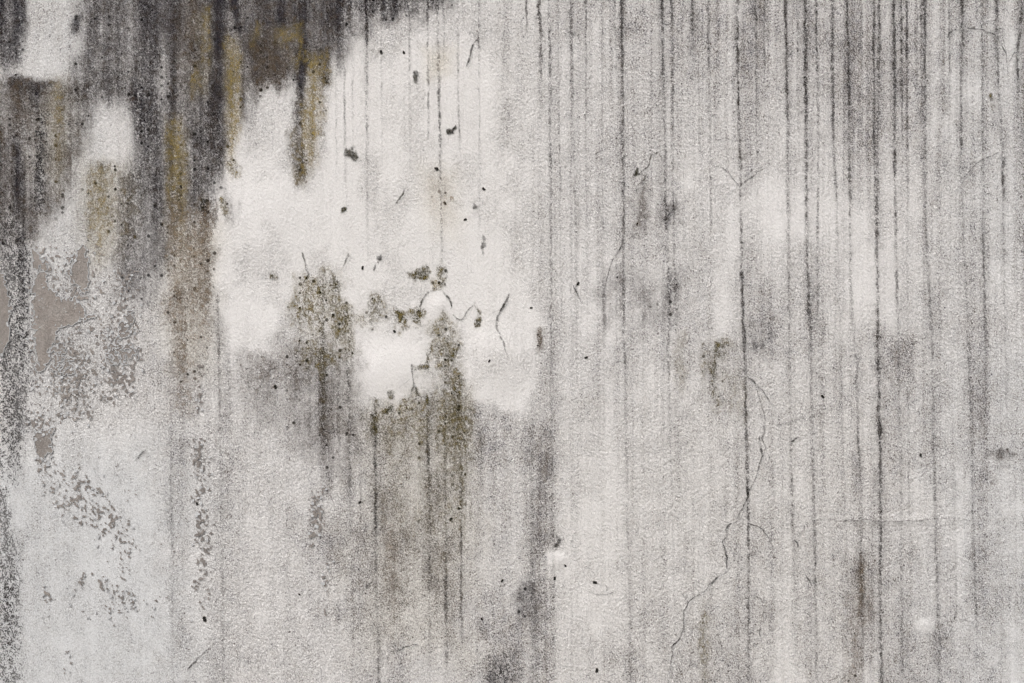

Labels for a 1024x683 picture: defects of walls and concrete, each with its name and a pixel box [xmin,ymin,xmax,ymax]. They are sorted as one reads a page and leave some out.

leakage [784,0,818,233]
leakage [861,0,926,135]
peeling [19,239,168,626]
leakage [0,0,453,683]
leakage [477,651,525,683]
crack [668,378,797,682]